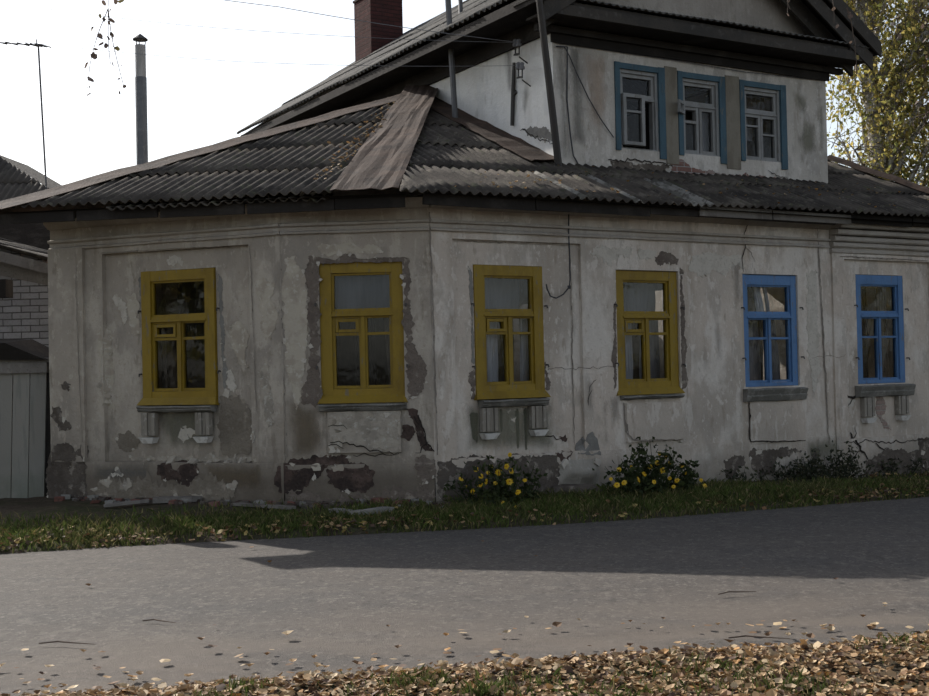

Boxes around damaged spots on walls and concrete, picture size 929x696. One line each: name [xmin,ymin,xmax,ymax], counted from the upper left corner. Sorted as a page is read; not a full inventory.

peeling [113,277,142,356]
flaking render [45,369,257,501]
crack [328,212,438,457]
peeling [274,252,603,505]
flaking render [655,251,688,390]
flaking render [724,446,821,481]
crack [815,229,928,459]
flaking render [865,435,929,477]